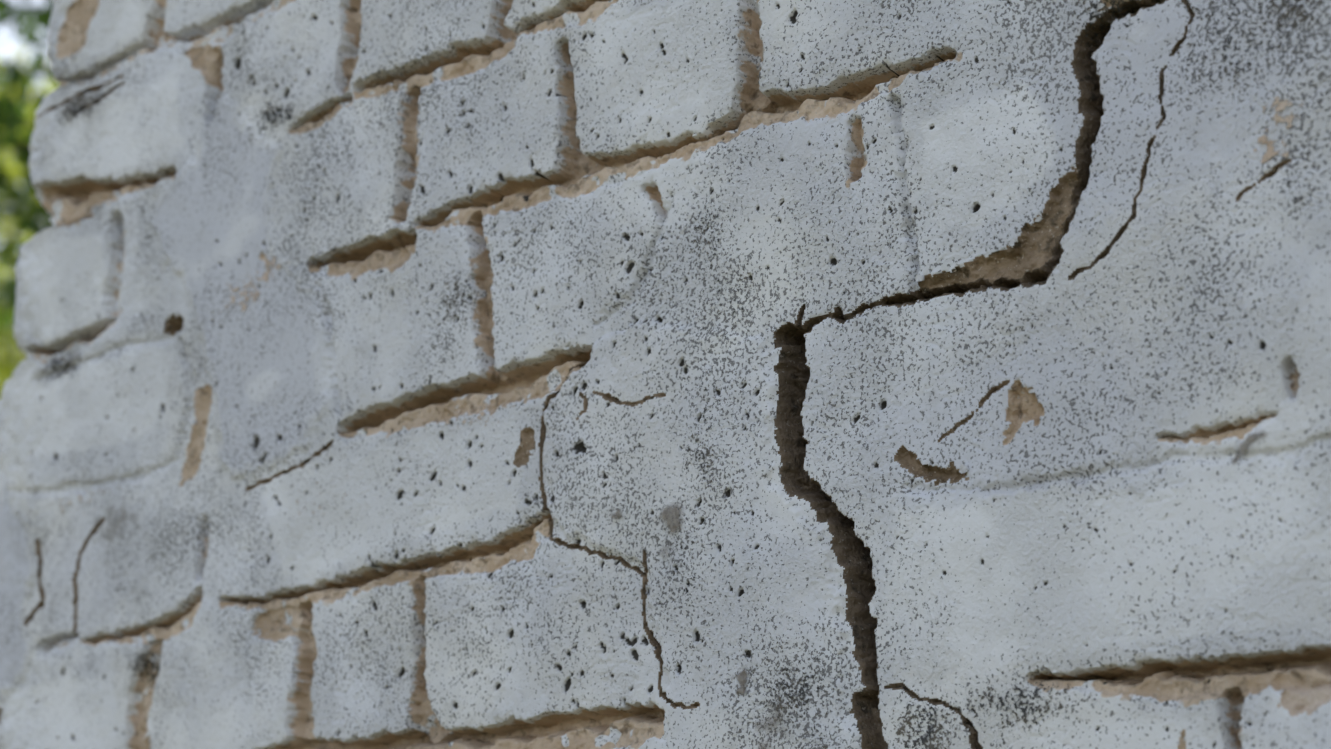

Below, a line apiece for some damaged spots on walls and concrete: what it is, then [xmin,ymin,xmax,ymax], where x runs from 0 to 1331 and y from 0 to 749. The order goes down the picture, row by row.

spalling [55,0,99,60]
peeling [1253,97,1305,163]
crack [1236,159,1292,202]
crack [774,0,1195,749]
spalling [1003,380,1045,445]
spalling [894,445,969,486]
crack [538,362,700,710]
crack [24,518,105,635]